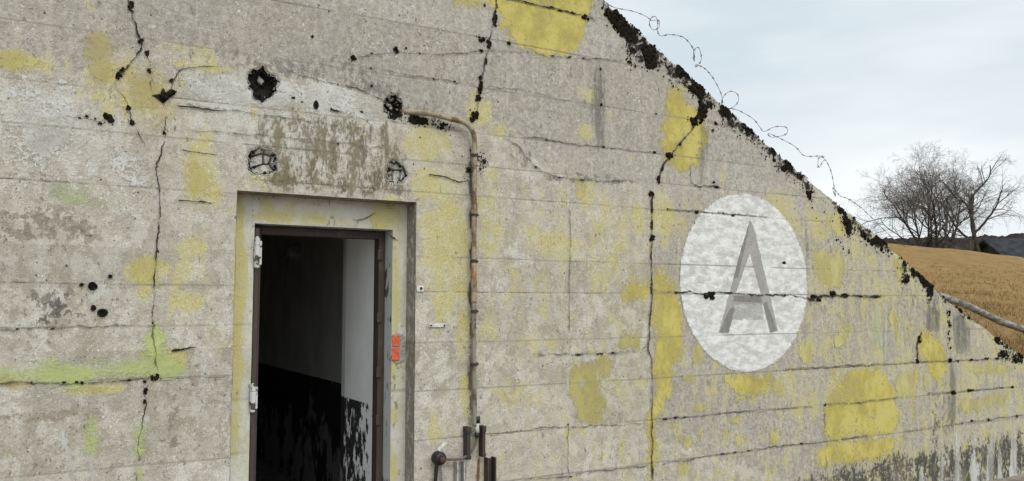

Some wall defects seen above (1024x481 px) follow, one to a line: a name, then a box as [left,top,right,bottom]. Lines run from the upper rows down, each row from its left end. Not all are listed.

peeling [181,65,411,202]
crack [541,54,632,106]
crack [0,0,599,480]
crack [491,116,895,479]
crack [913,332,999,363]
damp [799,363,1024,481]